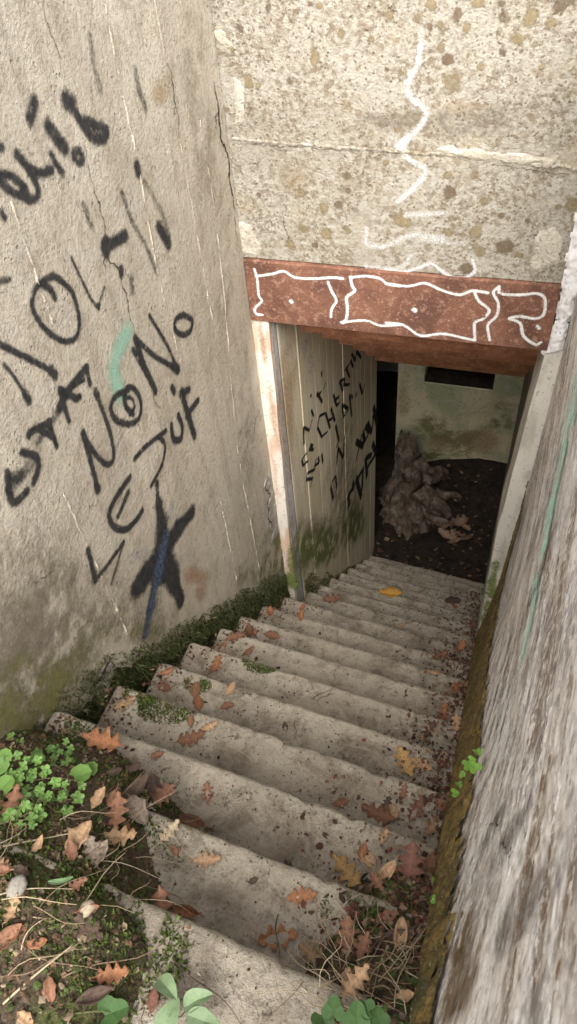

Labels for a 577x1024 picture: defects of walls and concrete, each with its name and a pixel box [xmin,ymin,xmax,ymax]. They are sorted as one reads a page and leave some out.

crack [214,83,438,235]